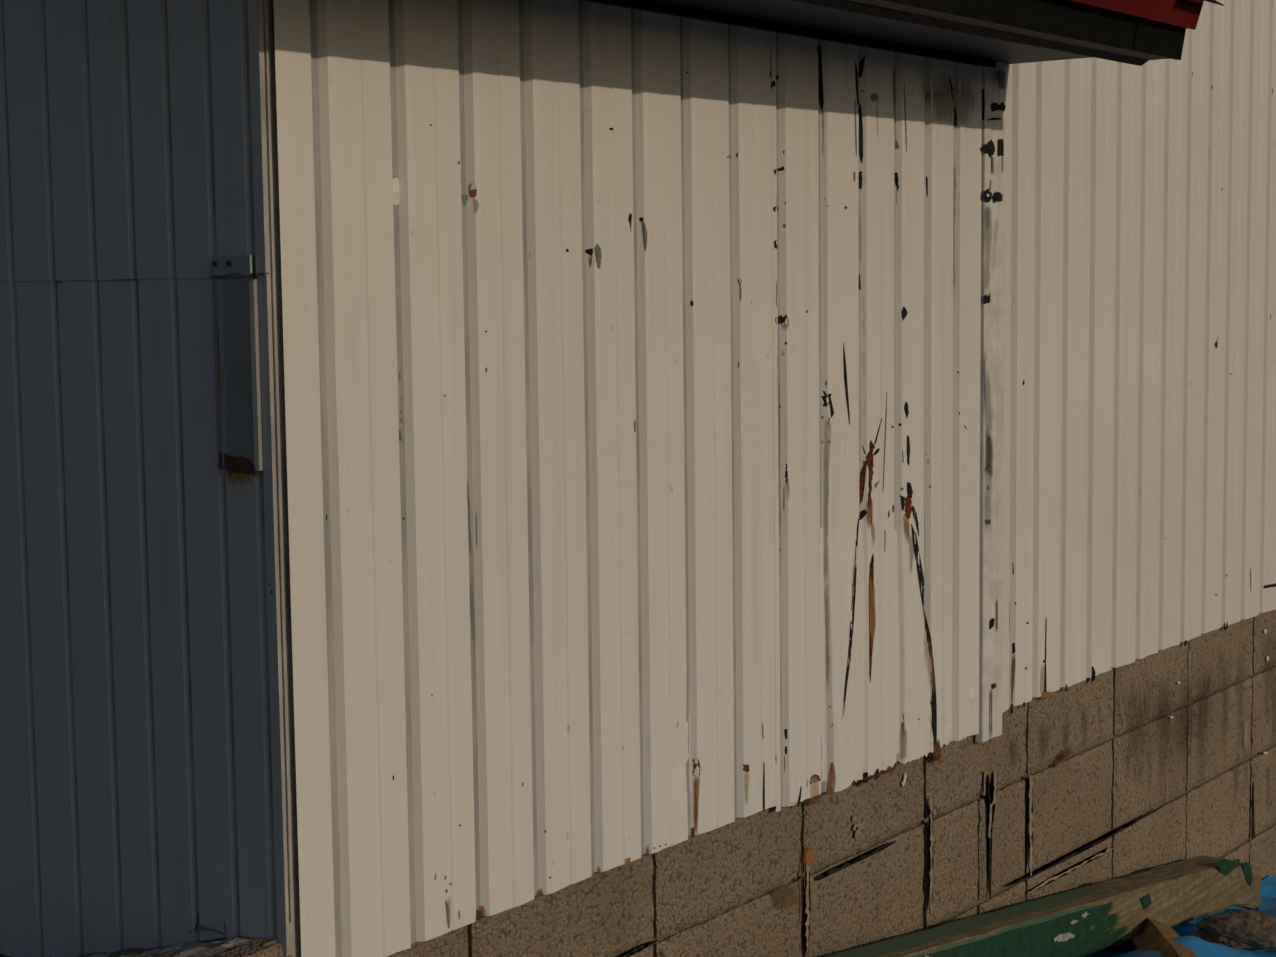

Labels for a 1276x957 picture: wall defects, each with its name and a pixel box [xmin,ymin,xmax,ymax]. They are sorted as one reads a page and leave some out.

corrosion [218,452,256,482]
damp [985,434,993,490]
corrosion [859,713,920,784]
corrosion [933,741,942,761]
corrosion [691,758,701,837]
corrosion [797,762,836,804]